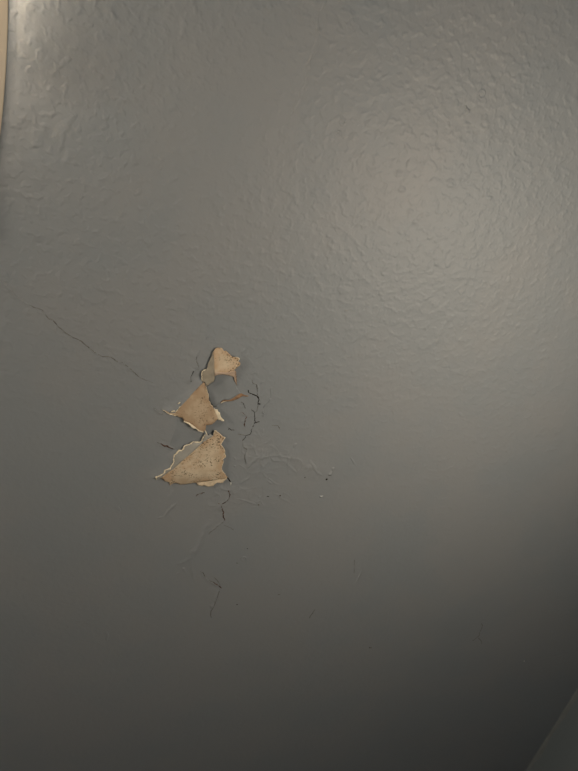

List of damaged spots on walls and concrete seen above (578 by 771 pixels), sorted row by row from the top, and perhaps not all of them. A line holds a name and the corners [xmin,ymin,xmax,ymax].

peeling [146,348,248,487]
crack [228,382,266,441]